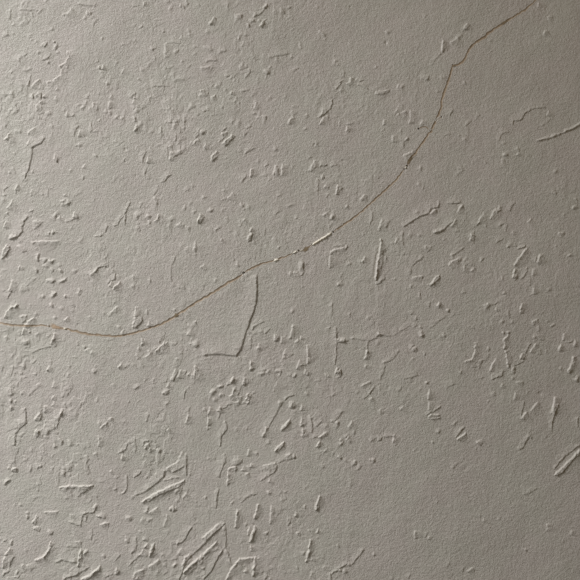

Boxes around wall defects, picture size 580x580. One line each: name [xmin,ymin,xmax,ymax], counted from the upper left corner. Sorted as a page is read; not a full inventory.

crack [0,0,538,339]